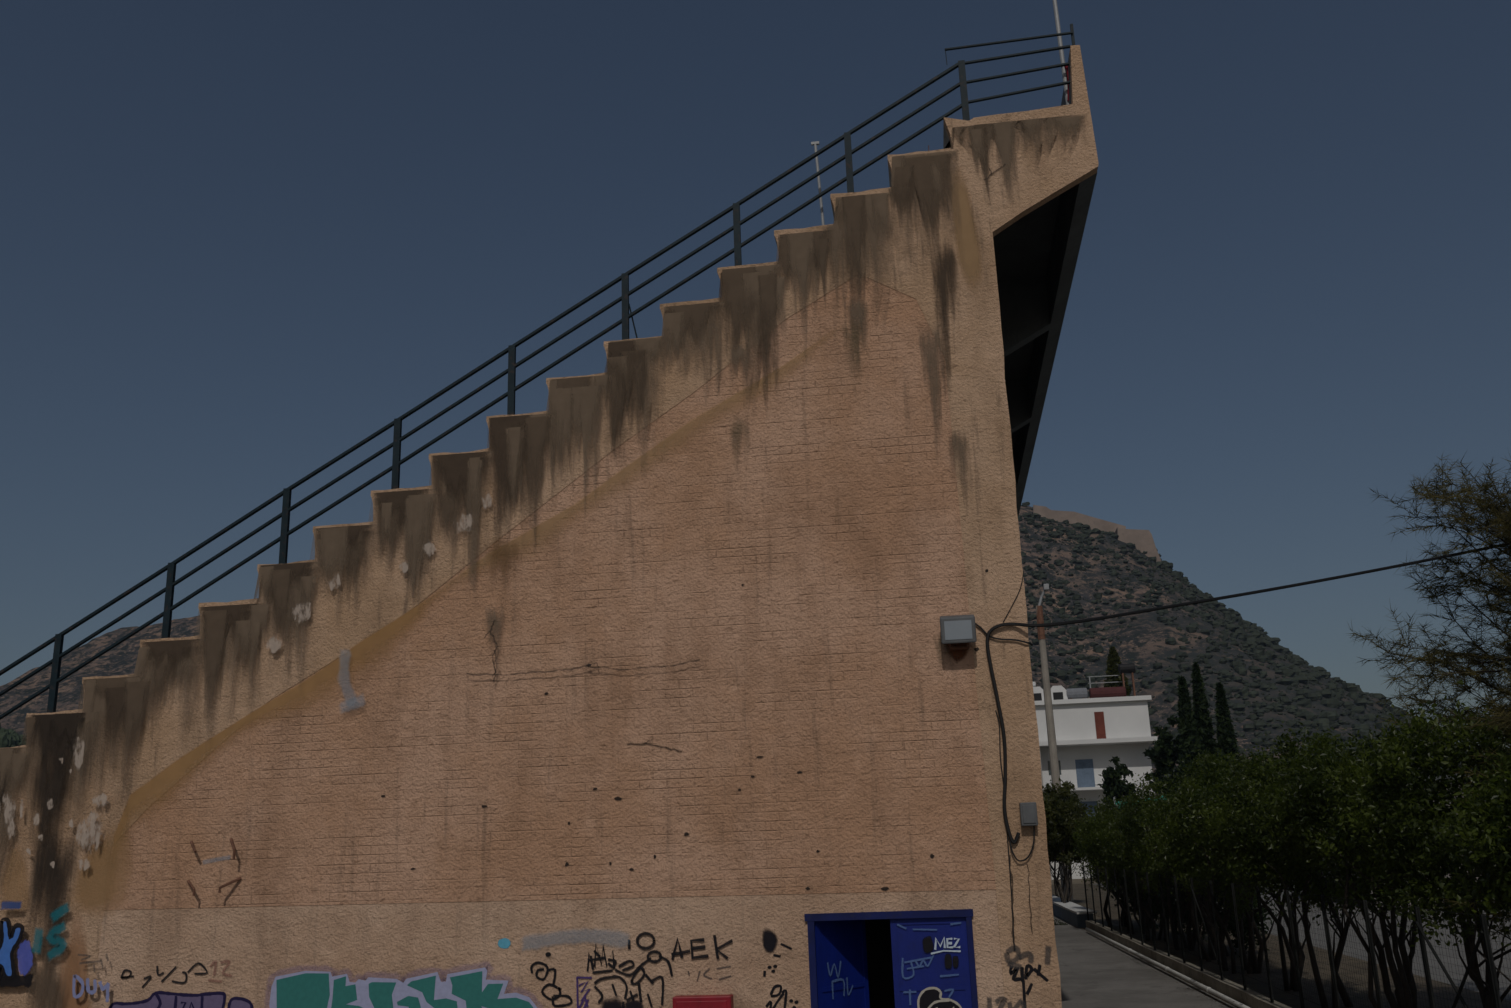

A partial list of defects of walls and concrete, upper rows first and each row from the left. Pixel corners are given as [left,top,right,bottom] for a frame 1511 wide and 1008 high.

damp [0,115,1084,1008]
crack [467,620,700,682]